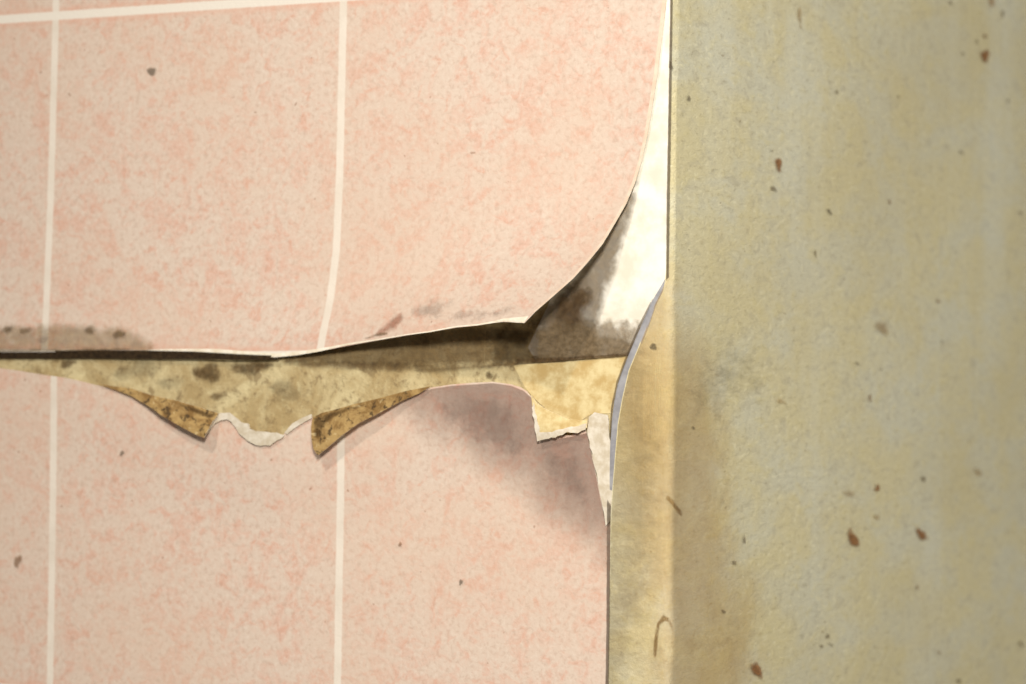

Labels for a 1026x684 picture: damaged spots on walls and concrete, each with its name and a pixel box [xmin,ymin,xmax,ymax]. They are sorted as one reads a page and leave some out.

flaking render [0,300,628,453]